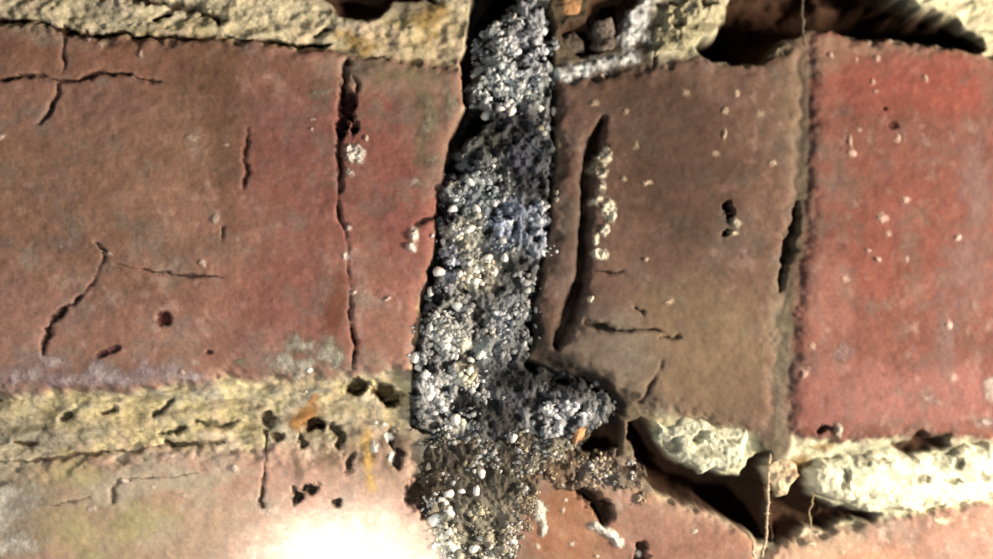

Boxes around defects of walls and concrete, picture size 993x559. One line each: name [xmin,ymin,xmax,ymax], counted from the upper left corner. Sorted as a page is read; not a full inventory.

crack [0,0,359,222]
crack [543,2,559,133]
crack [42,243,106,354]
crack [144,269,211,277]
crack [348,311,356,361]
crack [411,0,517,434]
crack [523,165,559,381]
crack [553,119,668,347]
spalling [405,476,431,520]
spalling [576,487,611,524]